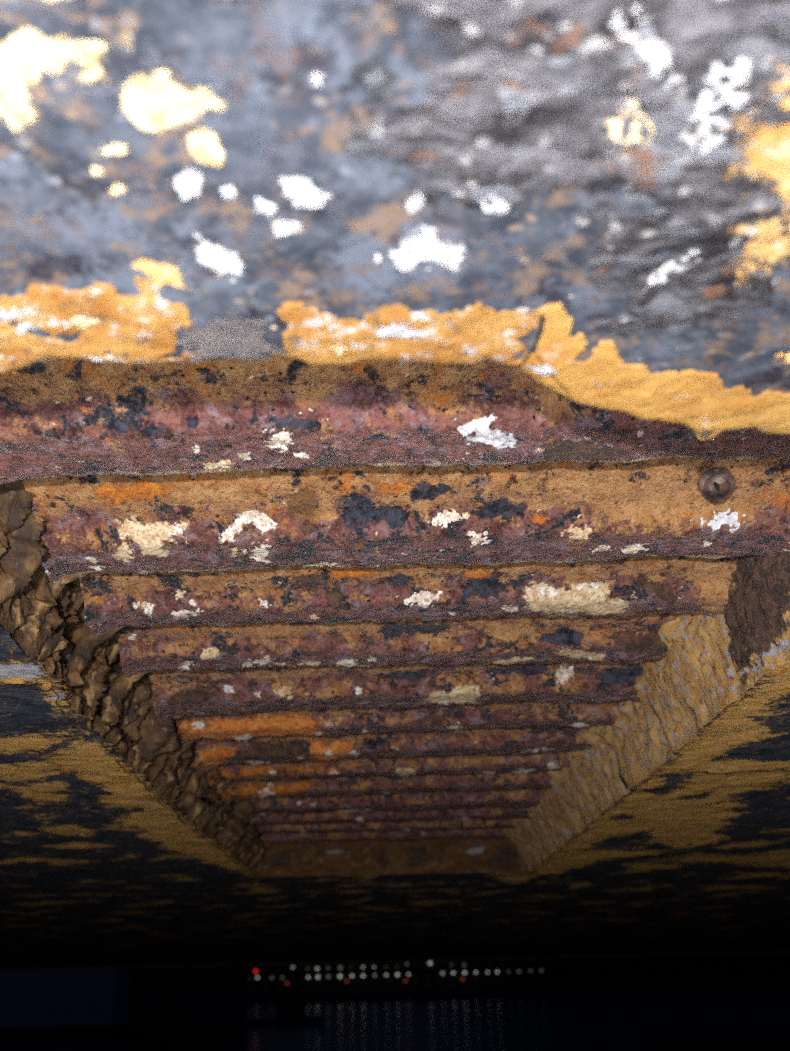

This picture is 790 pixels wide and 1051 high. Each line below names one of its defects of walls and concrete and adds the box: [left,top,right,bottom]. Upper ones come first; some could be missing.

spalling [254,0,790,440]
peeling [0,258,202,373]
peeling [454,414,521,450]
peeling [85,514,189,572]
rust [95,480,260,510]
peeling [218,510,278,563]
rust [285,479,460,536]
rust [476,439,770,542]
rust [242,616,584,648]
peeling [501,580,637,616]
rust [639,549,790,687]
rust [168,686,391,812]